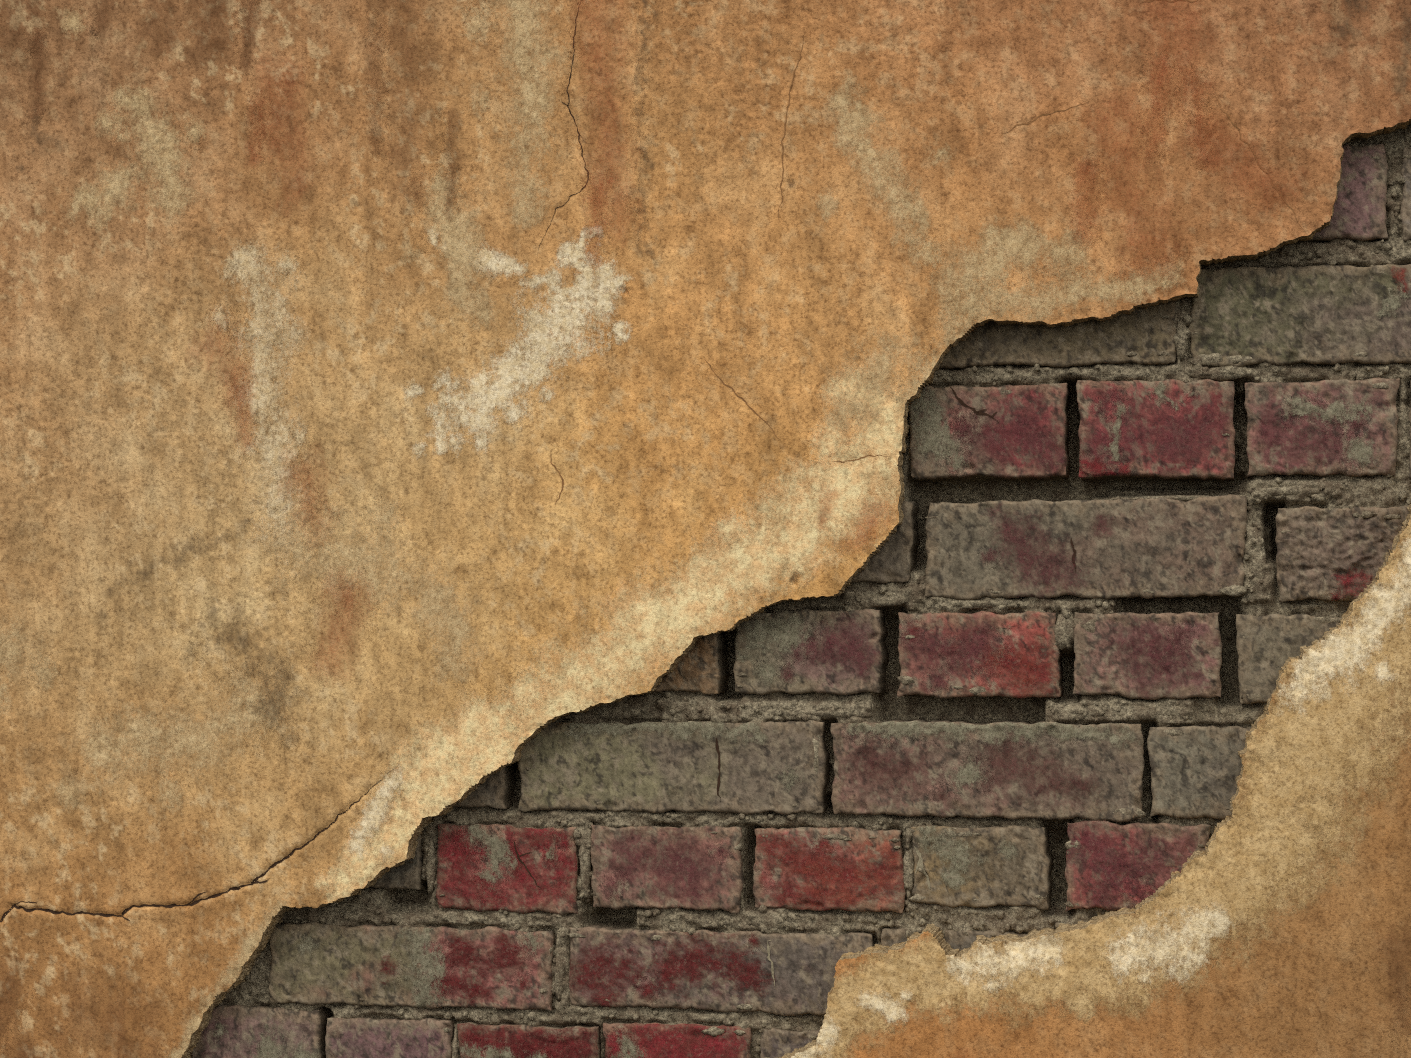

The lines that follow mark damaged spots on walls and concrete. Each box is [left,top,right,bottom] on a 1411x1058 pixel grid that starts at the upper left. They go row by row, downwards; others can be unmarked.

peeling [71,86,203,228]
crack [536,2,589,261]
crack [778,36,804,219]
peeling [212,241,479,682]
peeling [316,79,1411,912]
peeling [85,675,279,809]
crack [0,769,394,922]
peeling [779,504,1411,1058]
spalling [169,900,305,1058]
peeling [432,934,521,1003]
peeling [458,1023,739,1058]
peeling [570,935,764,1007]